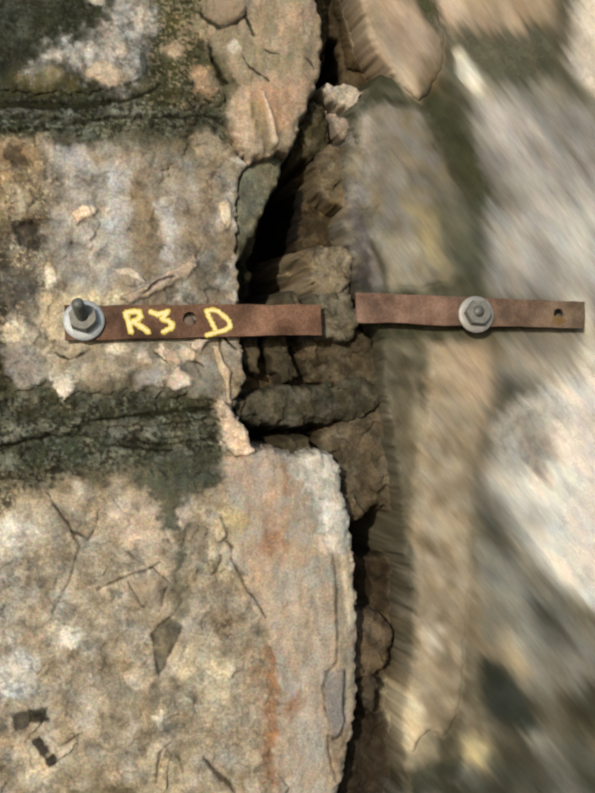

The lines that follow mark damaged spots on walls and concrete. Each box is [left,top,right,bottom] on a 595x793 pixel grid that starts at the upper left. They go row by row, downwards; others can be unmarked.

efflorescence [25,0,157,90]
crack [200,11,272,85]
crack [305,0,369,96]
crack [238,193,342,304]
water stain [48,373,78,398]
crack [219,337,237,355]
crack [237,335,301,397]
crack [353,549,390,625]
crack [353,646,391,715]